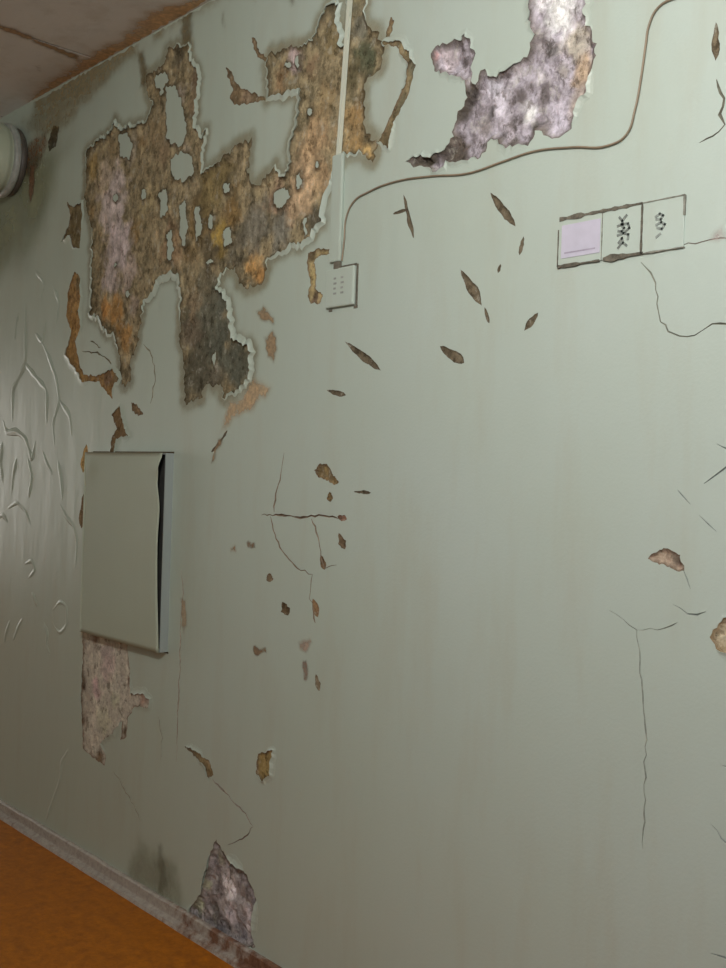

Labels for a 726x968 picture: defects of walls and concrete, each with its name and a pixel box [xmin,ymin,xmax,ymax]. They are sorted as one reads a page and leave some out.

spalling [406,0,597,175]
peeling [61,0,416,452]
peeling [491,193,515,226]
peeling [440,346,464,364]
peeling [461,271,490,323]
peeling [524,313,538,331]
crack [641,262,726,337]
crack [263,455,341,622]
spalling [710,612,726,660]
peeling [79,633,153,766]
crack [609,570,705,847]
spalling [186,840,258,948]